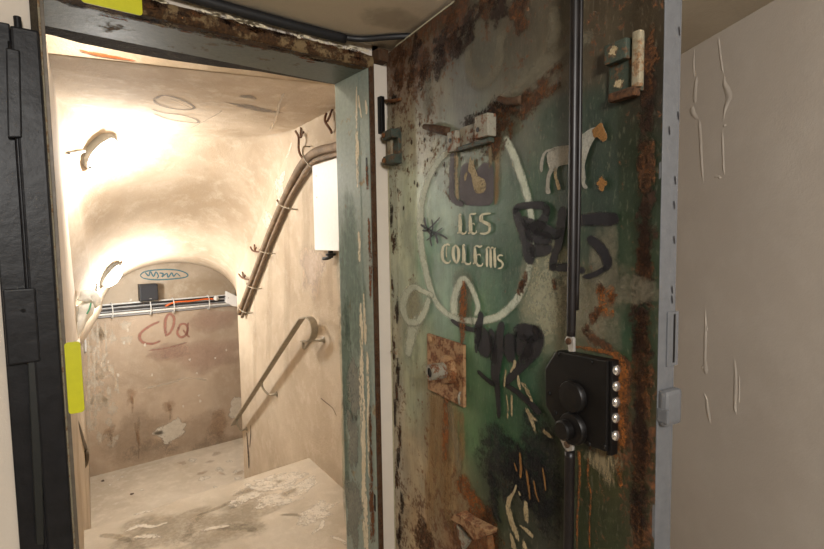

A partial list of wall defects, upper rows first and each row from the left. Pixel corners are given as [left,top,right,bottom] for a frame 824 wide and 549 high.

rust [55,0,365,69]
rust [391,0,528,105]
rust [460,63,562,161]
rust [459,281,467,344]
rust [517,271,528,295]
rust [576,24,660,549]
flaking render [152,417,186,444]
rust [442,398,502,548]
rust [415,516,435,549]